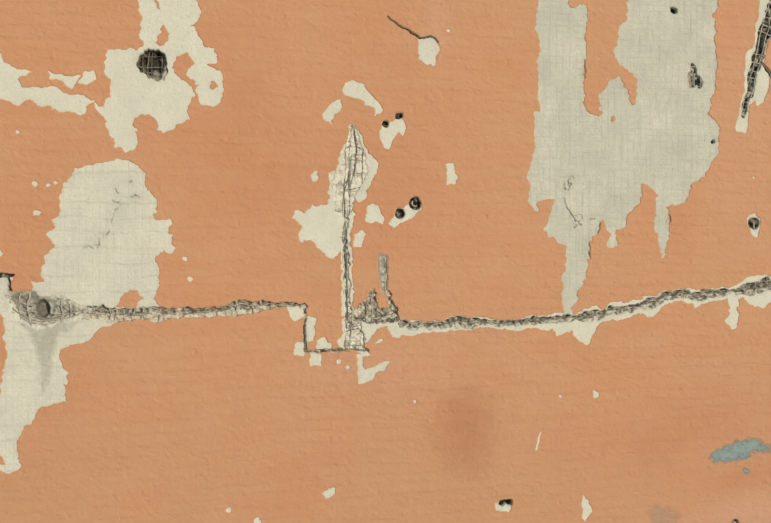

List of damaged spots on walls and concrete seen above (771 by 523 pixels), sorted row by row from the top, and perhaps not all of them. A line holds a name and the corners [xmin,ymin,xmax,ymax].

peeling [0,279,119,474]
peeling [0,0,224,309]
peeling [322,80,383,124]
peeling [287,124,422,384]
crack [0,273,771,353]
peeling [380,118,406,149]
crack [387,16,438,43]
peeling [526,0,720,322]